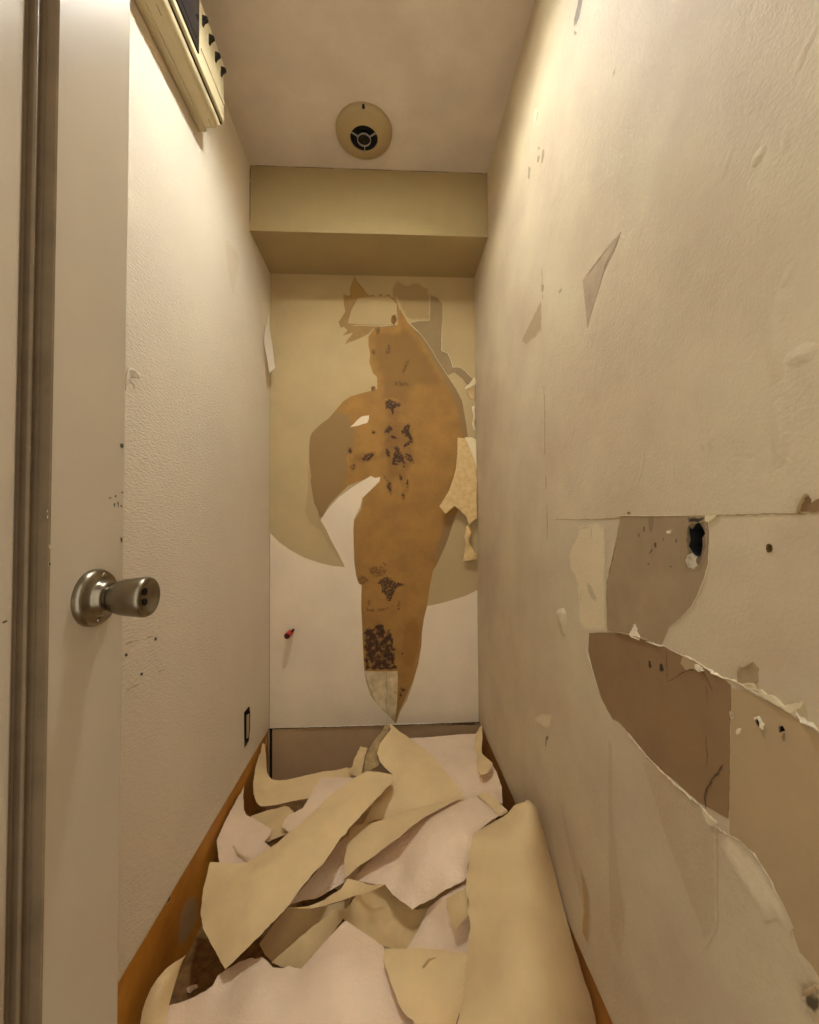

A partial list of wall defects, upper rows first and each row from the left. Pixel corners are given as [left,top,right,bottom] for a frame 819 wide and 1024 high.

peeling [583,232,621,328]
leakage [348,398,415,501]
peeling [309,310,468,722]
leakage [357,561,406,671]
peeling [606,512,717,644]
crack [704,742,723,808]
peeling [702,662,819,977]